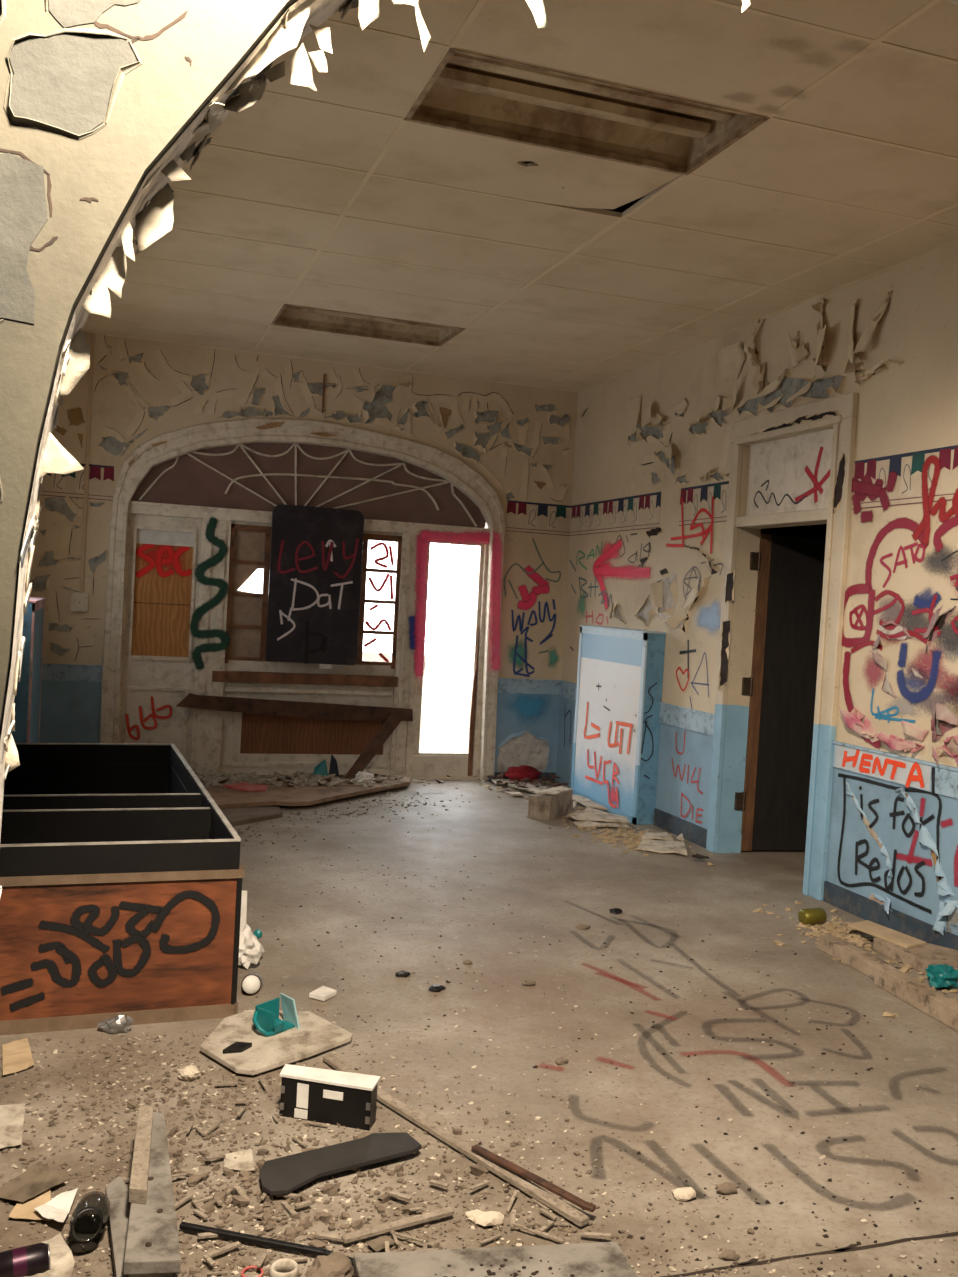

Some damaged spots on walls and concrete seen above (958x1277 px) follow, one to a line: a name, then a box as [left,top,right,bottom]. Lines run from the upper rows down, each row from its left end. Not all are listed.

peeling [525,0,547,29]
peeling [82,0,431,318]
peeling [18,328,174,614]
peeling [217,370,572,491]
peeling [627,290,905,486]
peeling [832,453,845,515]
peeling [609,545,735,635]
peeling [4,637,25,780]
peeling [718,620,730,691]
peeling [839,703,958,768]
peeling [870,605,957,699]
peeling [895,786,958,936]